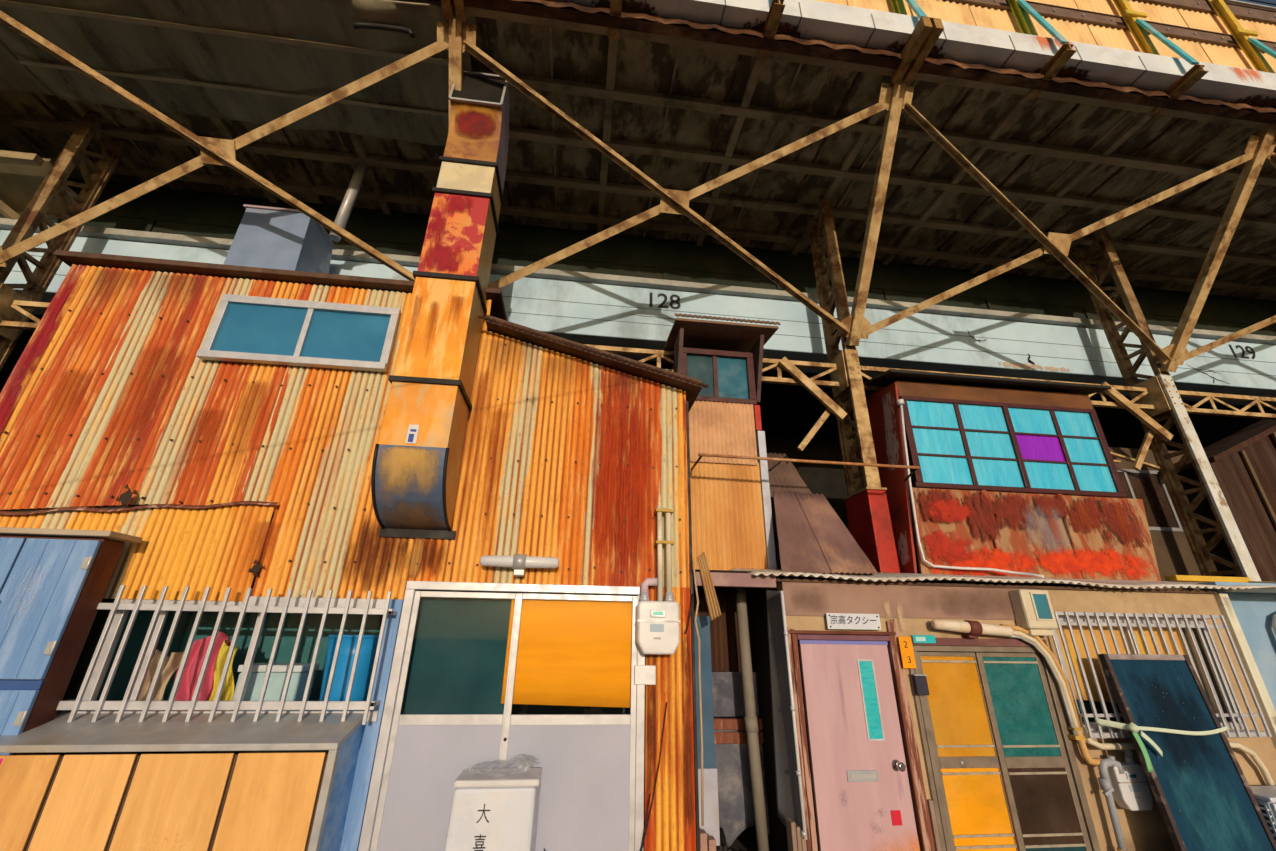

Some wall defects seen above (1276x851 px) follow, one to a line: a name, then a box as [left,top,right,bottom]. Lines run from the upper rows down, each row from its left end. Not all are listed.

rust [455,103,495,138]
rust [422,195,471,272]
rust [0,280,77,432]
rust [381,447,437,491]
rust [592,393,651,556]
rust [343,503,444,587]
rust [648,685,656,791]
rust [683,647,692,826]